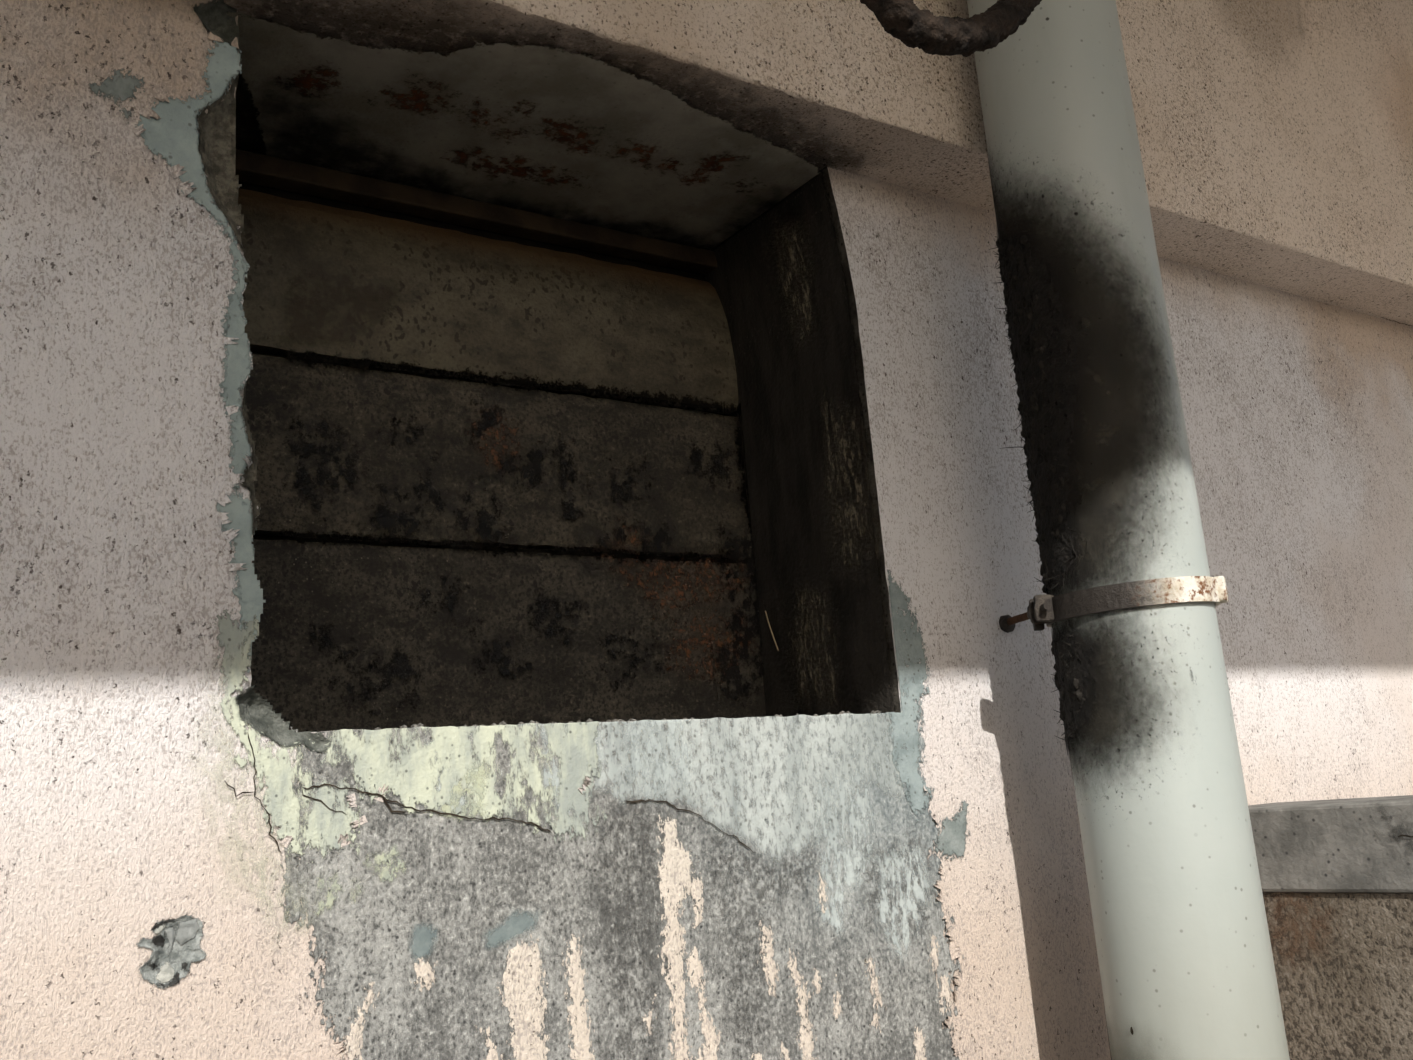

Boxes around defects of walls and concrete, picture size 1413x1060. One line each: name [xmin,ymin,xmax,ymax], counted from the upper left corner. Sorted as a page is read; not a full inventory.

rust [368,74,758,192]
peeling [89,0,971,1060]
crack [624,799,755,853]